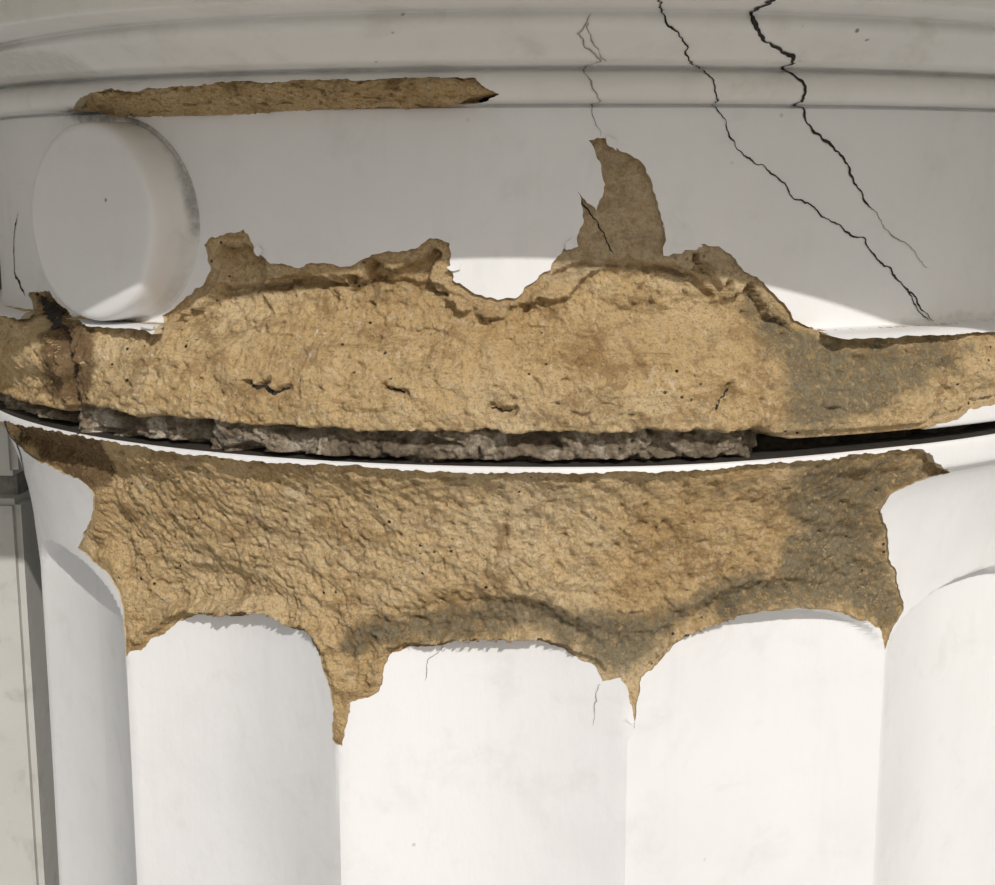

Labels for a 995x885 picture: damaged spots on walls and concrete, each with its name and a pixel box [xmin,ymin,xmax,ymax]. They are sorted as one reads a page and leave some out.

spalling [69,77,499,118]
crack [577,14,606,135]
crack [657,0,933,321]
crack [13,215,79,375]
spalling [0,136,995,439]
crack [0,392,995,490]
spalling [0,421,950,746]